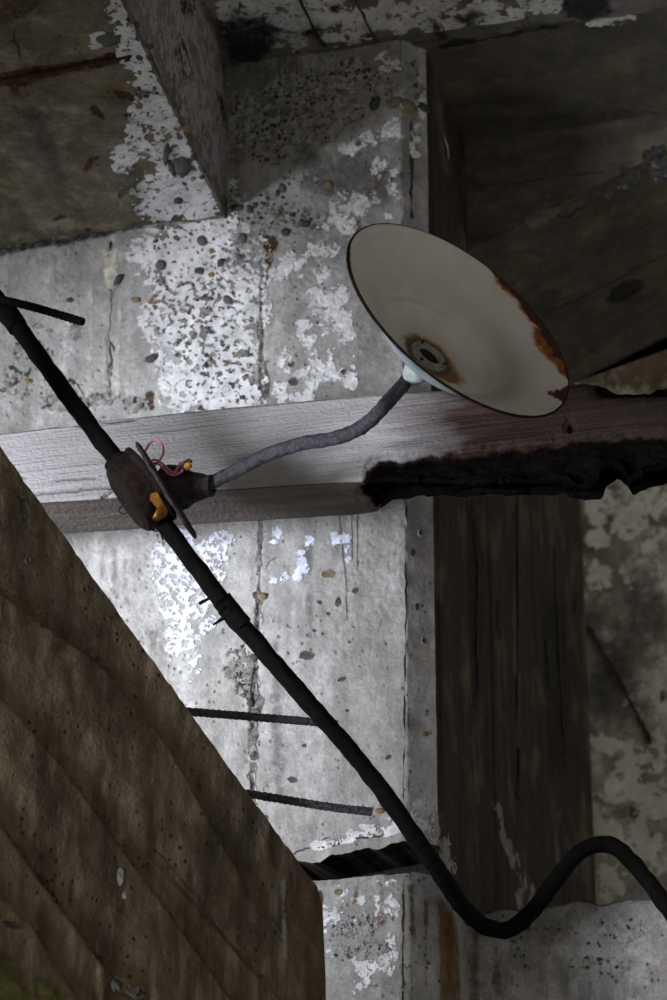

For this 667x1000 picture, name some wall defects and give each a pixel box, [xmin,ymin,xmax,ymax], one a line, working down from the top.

rust [0,54,131,95]
peeling [74,0,564,415]
spalling [0,342,66,413]
crack [256,288,270,405]
peeling [151,541,217,683]
peeling [179,524,236,581]
crack [253,520,276,630]
spalling [221,645,261,763]
crack [246,661,264,803]
peeling [310,808,401,851]
peeling [322,879,400,1000]